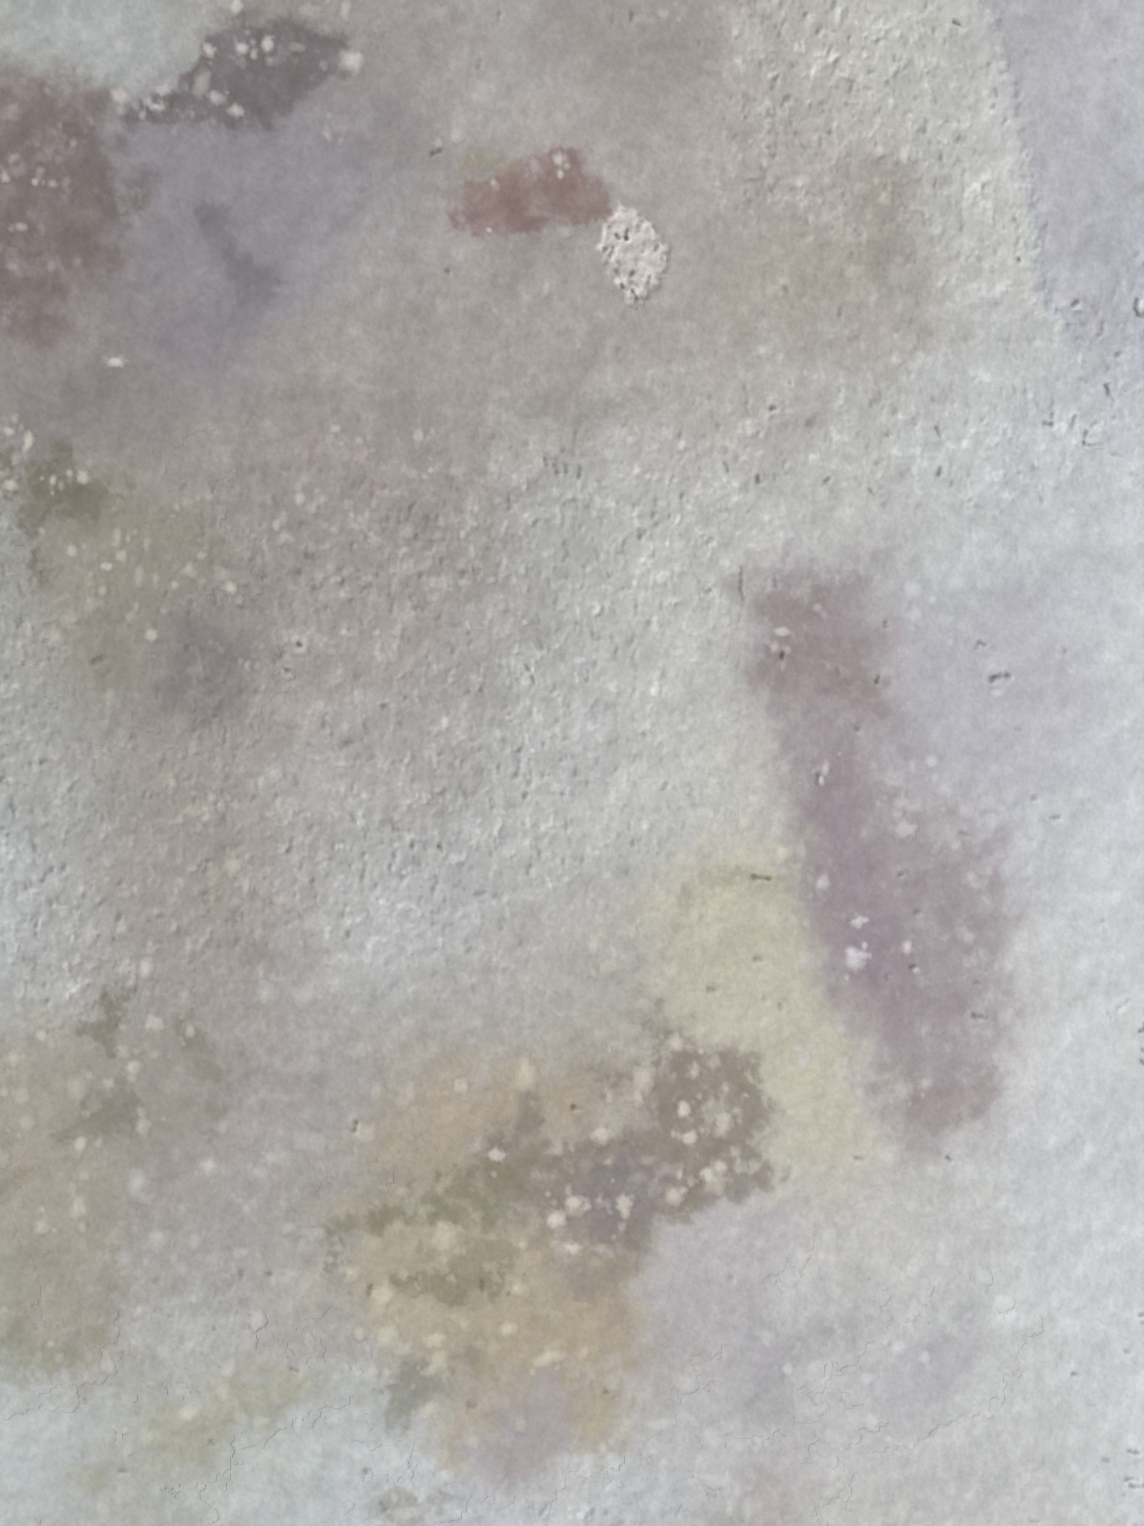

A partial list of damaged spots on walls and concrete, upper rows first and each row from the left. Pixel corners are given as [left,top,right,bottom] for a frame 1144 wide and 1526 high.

leakage [0,0,464,459]
corrosion [425,126,644,264]
leakage [595,200,671,309]
leakage [0,587,361,1344]
leakage [288,499,1136,1526]